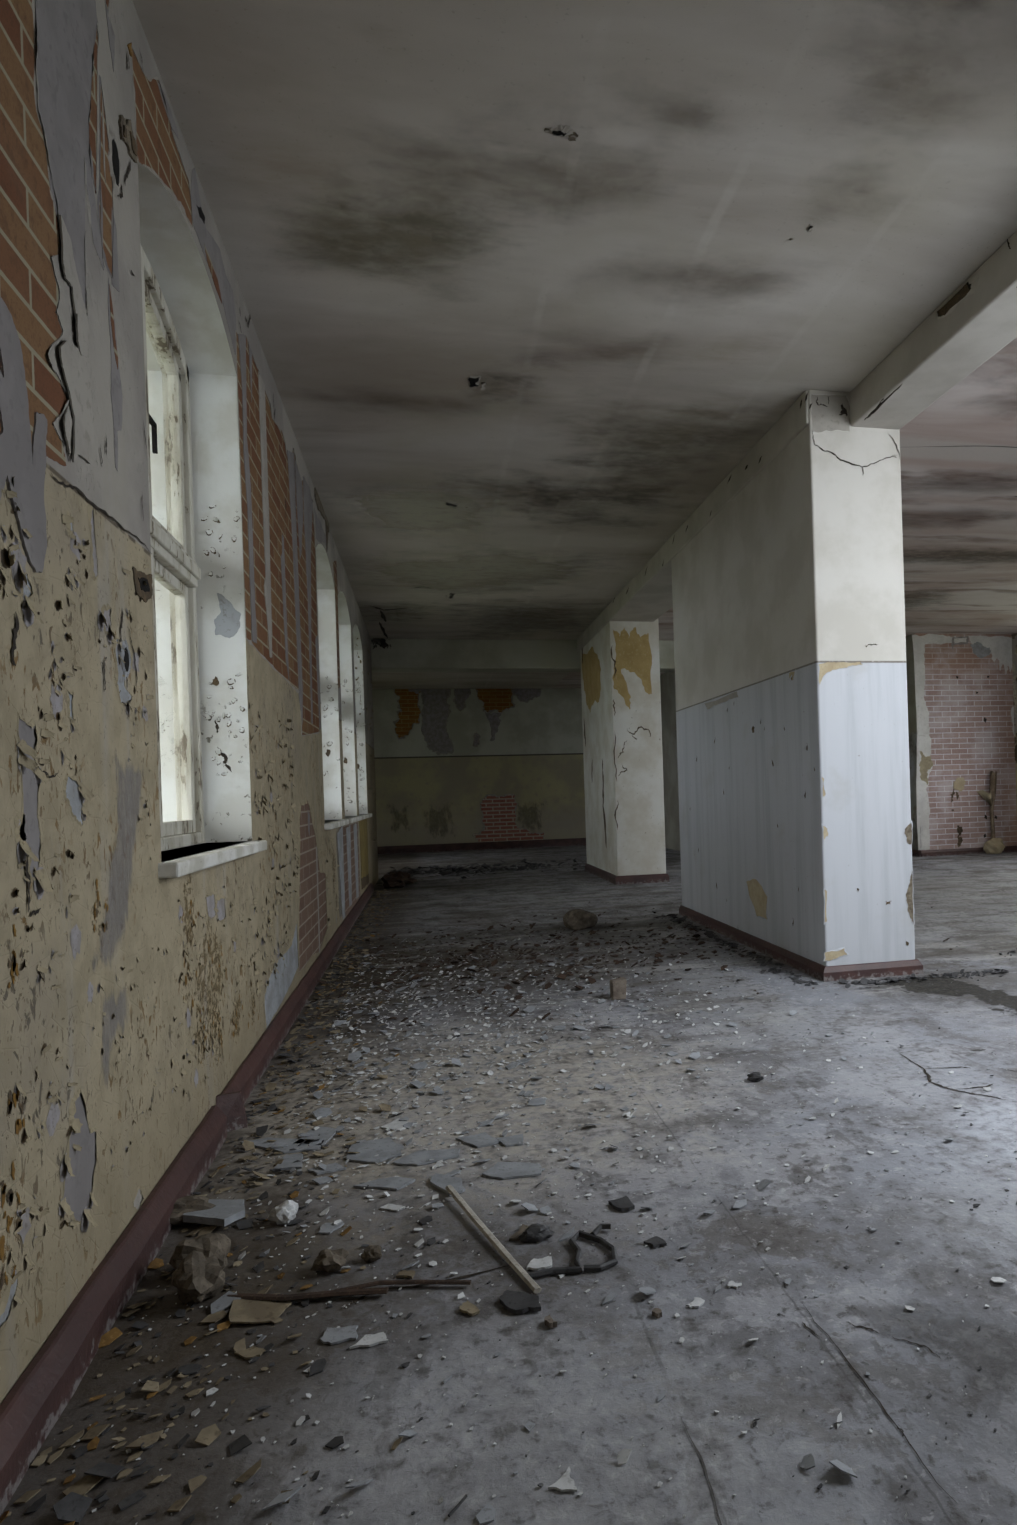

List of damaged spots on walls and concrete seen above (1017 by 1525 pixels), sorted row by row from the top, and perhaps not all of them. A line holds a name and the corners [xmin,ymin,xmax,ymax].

flaking render [107,115,138,200]
crack [812,385,901,474]
peeling [97,564,154,762]
peeling [582,627,652,711]
peeling [0,476,94,990]
peeling [903,634,1017,851]
peeling [0,672,300,1331]
leakage [877,973,1017,1016]
crack [681,1418,722,1525]